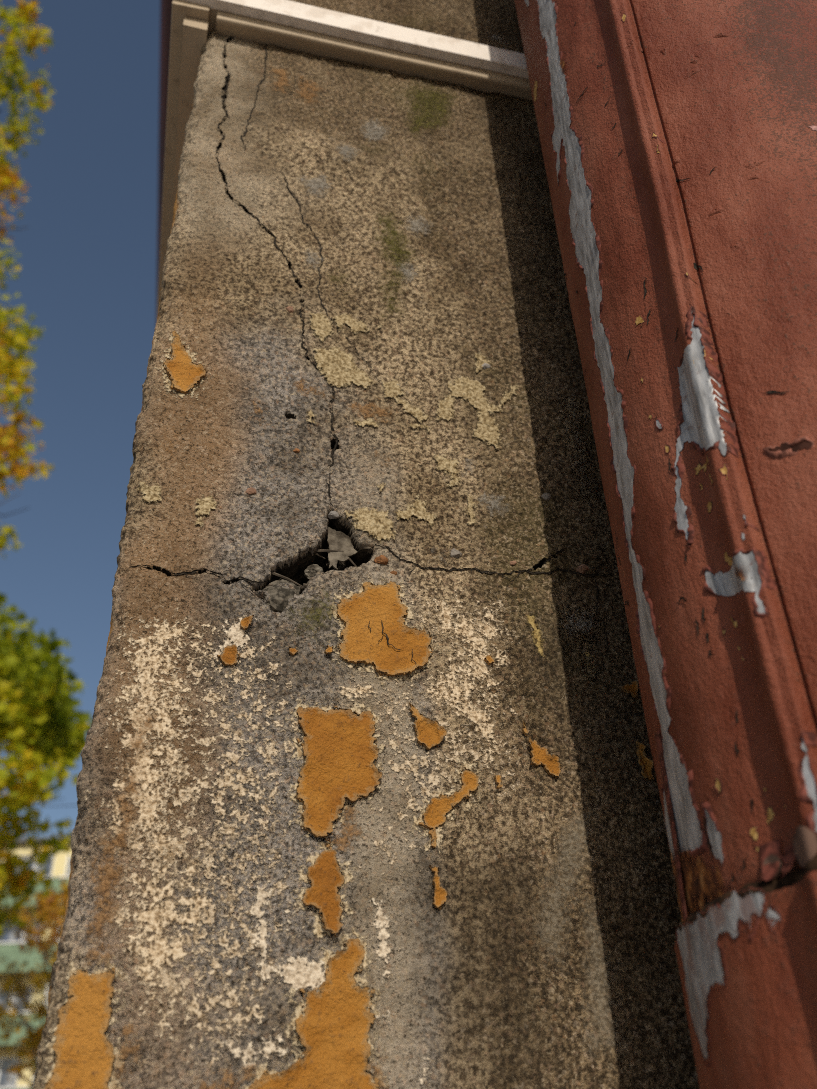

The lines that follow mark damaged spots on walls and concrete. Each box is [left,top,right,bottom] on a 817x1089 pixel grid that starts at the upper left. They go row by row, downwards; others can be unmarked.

crack [215,36,380,506]
crack [129,565,277,617]
spalling [256,518,373,613]
peeling [324,576,441,685]
crack [375,544,629,650]
peeling [522,0,796,1067]
peeling [409,702,447,750]
peeling [407,757,503,854]
peeling [797,731,817,835]
peeling [229,699,389,1089]
peeling [429,865,448,910]
peeling [42,954,129,1089]